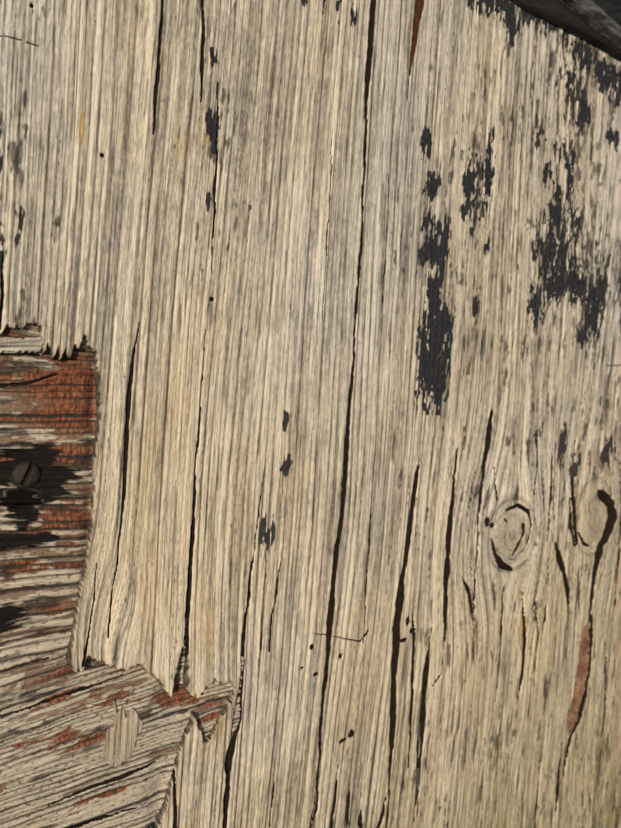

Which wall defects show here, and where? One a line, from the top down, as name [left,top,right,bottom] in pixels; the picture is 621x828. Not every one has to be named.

crack [200,0,219,117]
crack [210,140,218,272]
peeling [414,124,496,416]
peeling [467,0,621,137]
peeling [526,149,606,349]
peeling [604,126,620,154]
crack [309,0,621,828]
peeling [0,324,244,828]
crack [222,485,281,828]